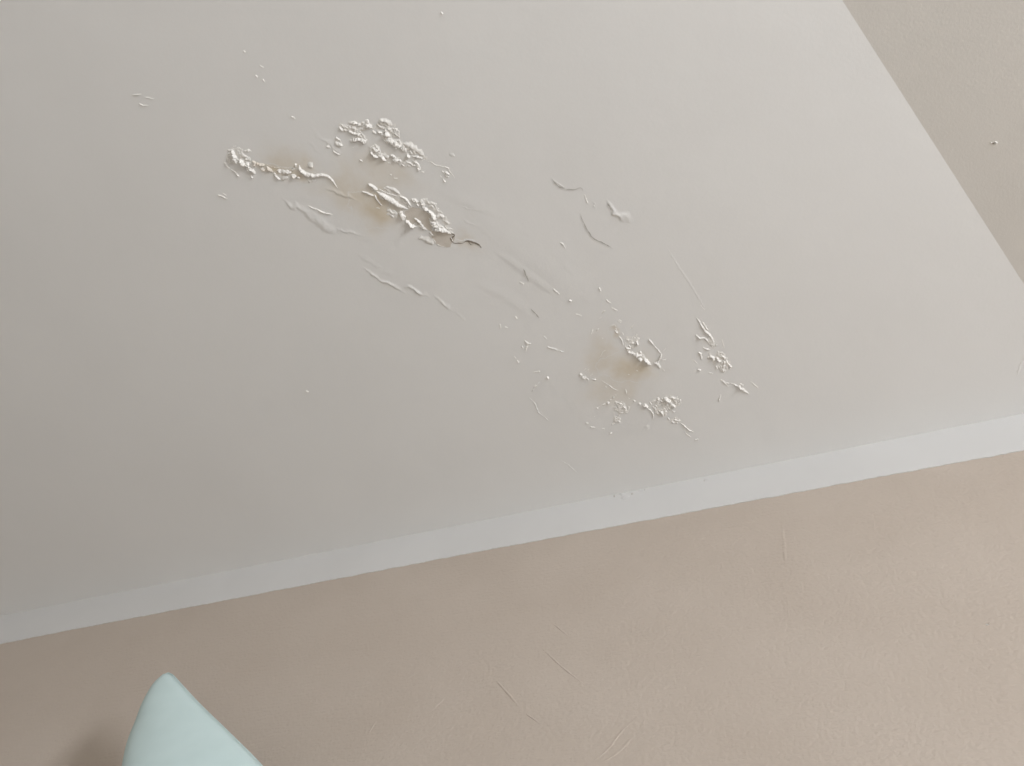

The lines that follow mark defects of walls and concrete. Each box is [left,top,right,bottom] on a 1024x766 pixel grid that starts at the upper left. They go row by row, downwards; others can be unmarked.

peeling [224,146,337,187]
water stain [235,128,443,250]
peeling [327,118,455,247]
crack [450,233,481,247]
water stain [447,222,491,258]
water stain [564,314,682,420]
peeling [591,287,666,375]
peeling [579,368,698,440]
peeling [692,306,758,402]